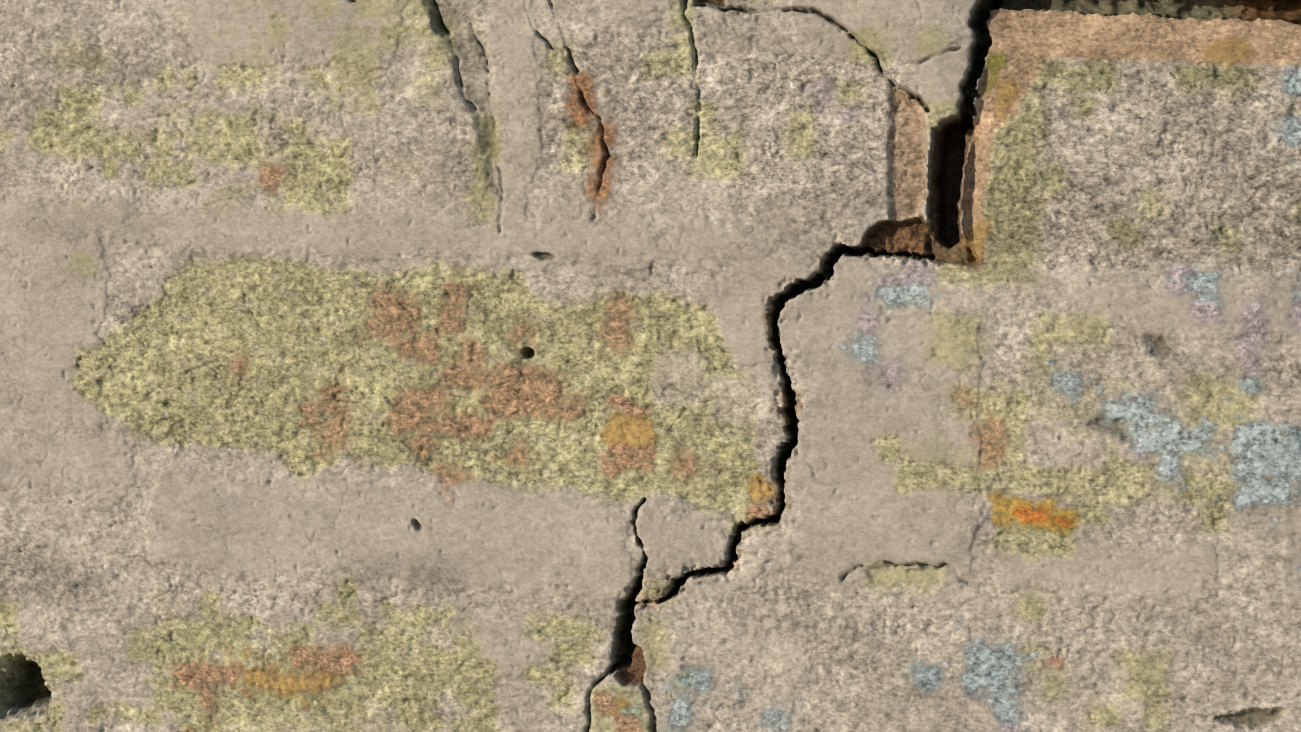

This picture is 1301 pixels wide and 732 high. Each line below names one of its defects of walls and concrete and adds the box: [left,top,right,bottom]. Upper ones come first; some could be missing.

crack [335,0,385,8]
crack [426,0,506,237]
corrosion [566,73,617,203]
spalling [889,88,938,222]
spalling [963,8,1301,275]
crack [582,0,1003,732]
spalling [0,597,84,732]
spalling [86,579,500,732]